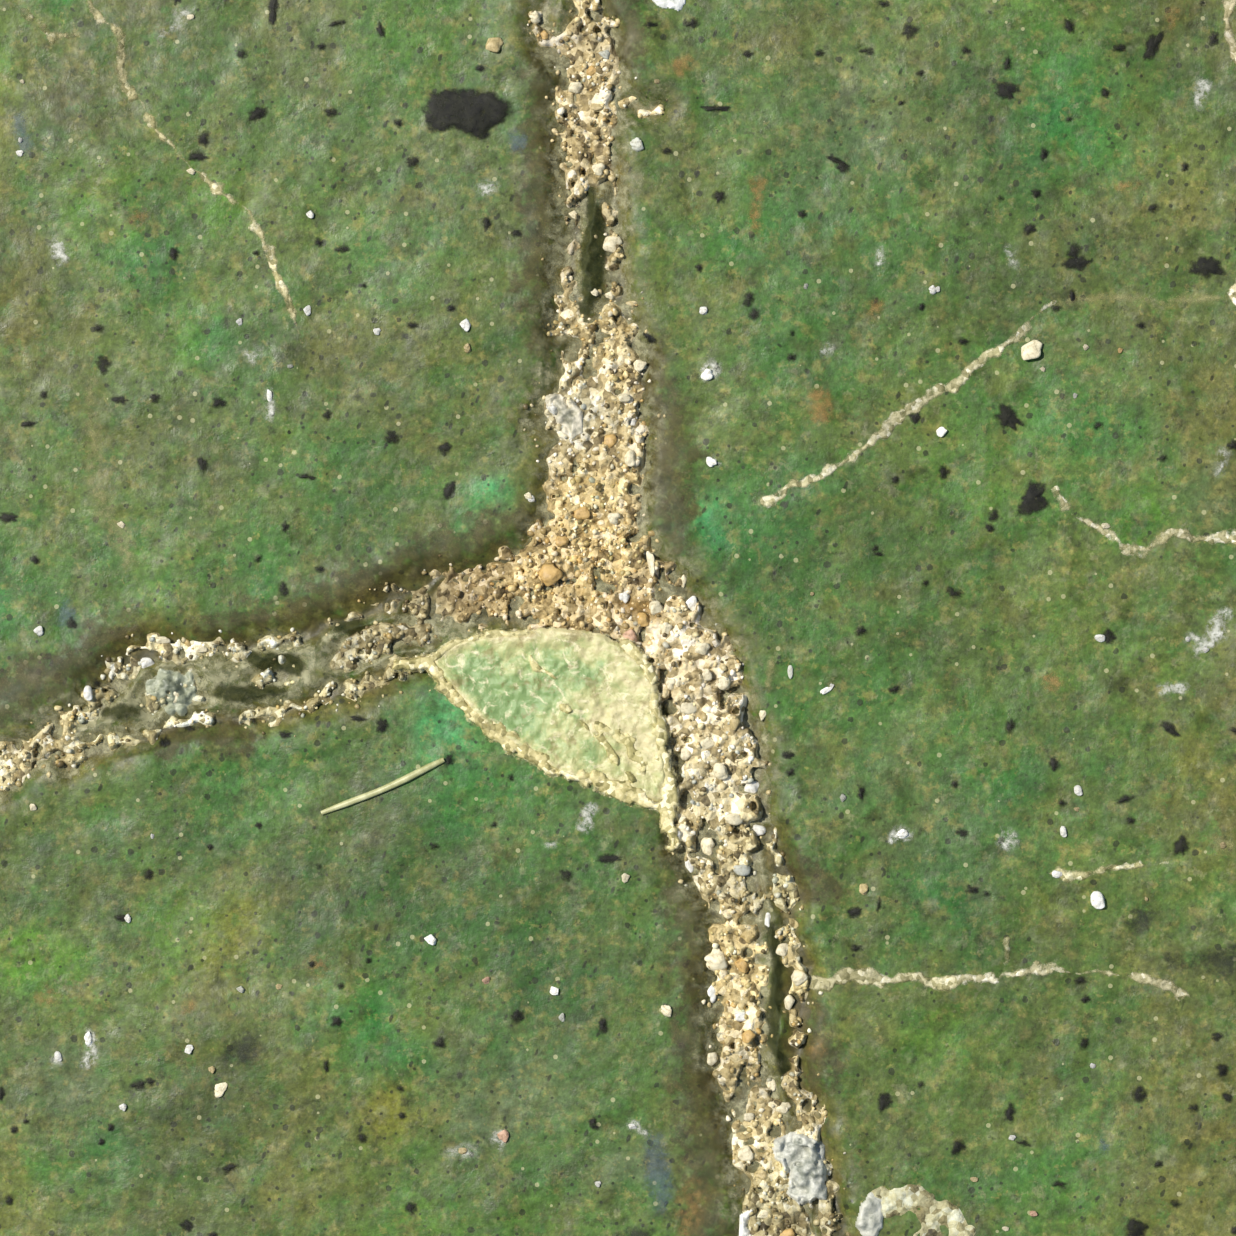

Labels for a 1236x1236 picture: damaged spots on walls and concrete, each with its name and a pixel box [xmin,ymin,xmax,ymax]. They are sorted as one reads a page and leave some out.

crack [1223,0,1236,64]
crack [26,1,175,148]
crack [199,172,296,318]
crack [1228,284,1236,305]
crack [760,300,1057,507]
crack [1054,486,1236,555]
crack [327,0,999,1236]
crack [0,632,337,792]
crack [1005,961,1065,977]
crack [1086,971,1188,998]
peeling [855,1192,884,1236]